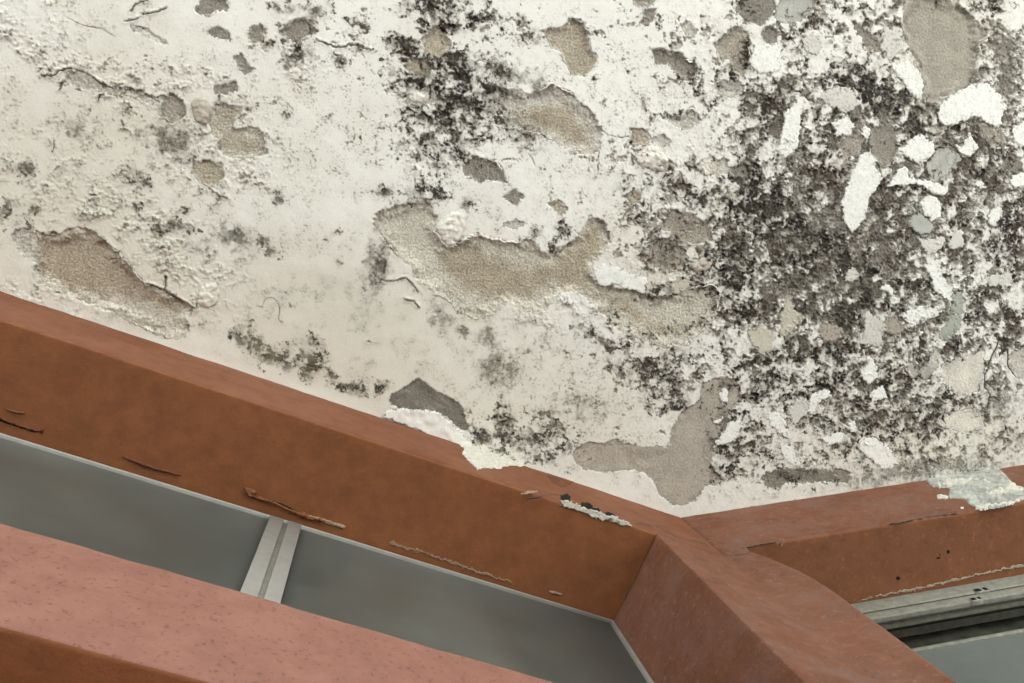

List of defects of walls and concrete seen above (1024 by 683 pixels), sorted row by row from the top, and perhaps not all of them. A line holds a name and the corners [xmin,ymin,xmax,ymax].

spalling [540,19,598,77]
damp [266,0,548,211]
spalling [12,227,193,340]
spalling [374,197,721,349]
damp [548,220,576,254]
damp [561,0,1024,491]
spalling [818,0,1024,433]
damp [228,325,389,398]
damp [481,328,519,383]
spalling [381,378,524,470]
damp [460,396,592,465]
spalling [573,378,743,506]